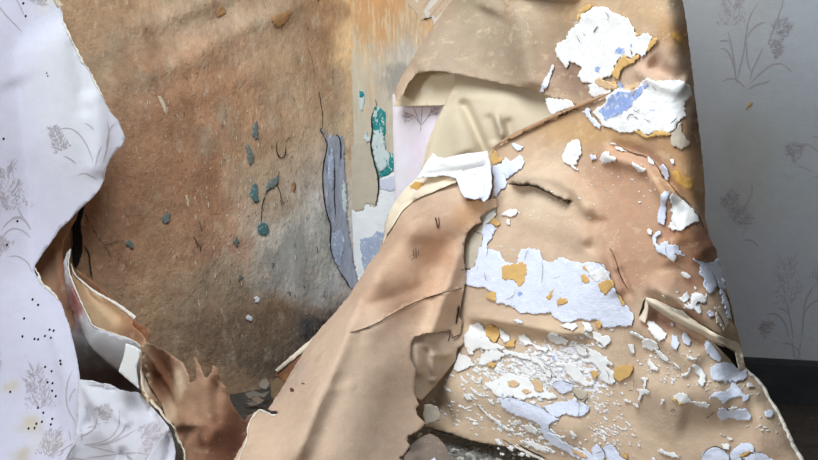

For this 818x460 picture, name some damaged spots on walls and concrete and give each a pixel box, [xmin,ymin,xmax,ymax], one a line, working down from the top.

peeling [540,5,692,150]
flaking render [235,102,306,237]
peeling [490,143,525,197]
peeling [562,139,625,190]
peeling [631,157,735,332]
peeling [431,208,780,460]